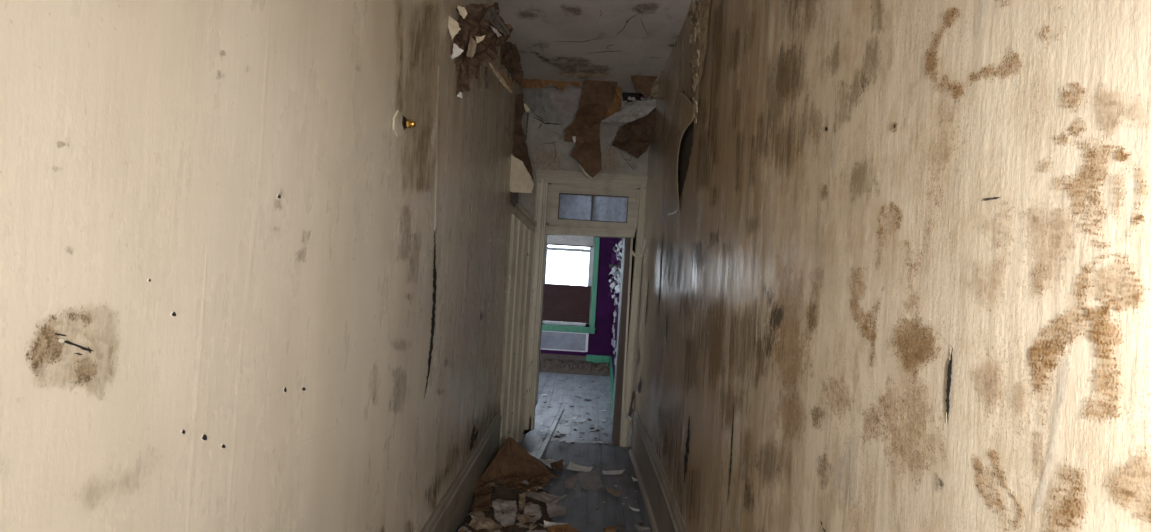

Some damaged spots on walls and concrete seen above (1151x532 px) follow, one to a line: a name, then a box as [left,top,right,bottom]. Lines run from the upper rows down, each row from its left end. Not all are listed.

peeling [448,5,486,59]
spalling [622,92,647,106]
leakage [26,312,91,376]
leakage [75,358,97,386]
crack [945,348,954,422]